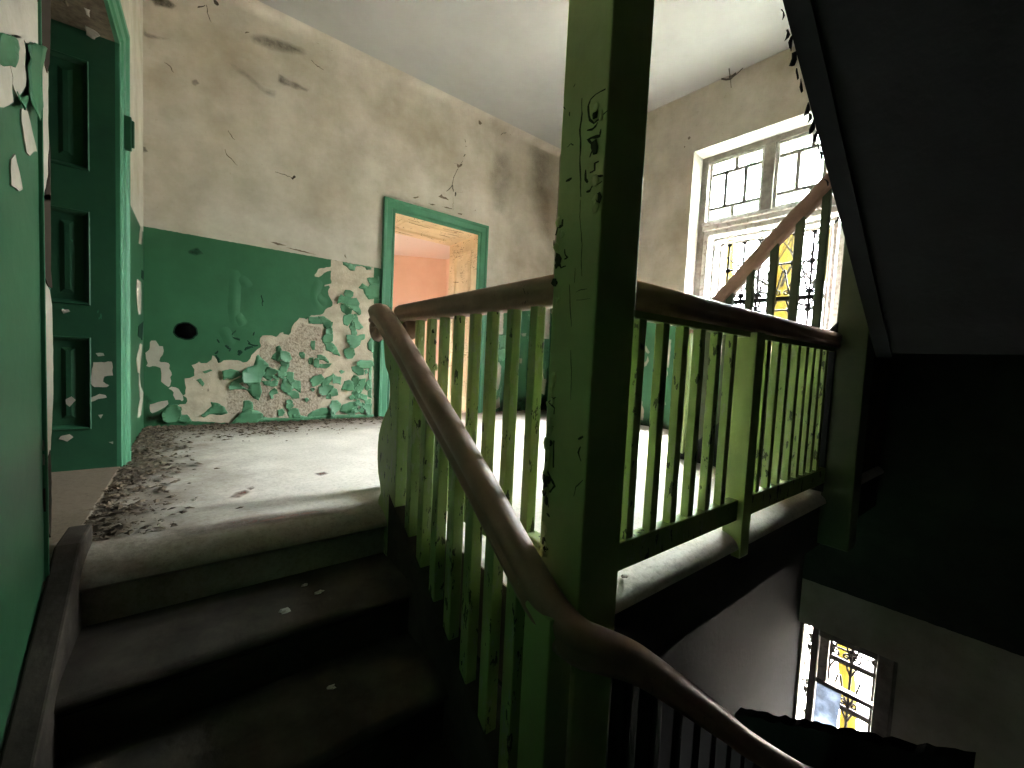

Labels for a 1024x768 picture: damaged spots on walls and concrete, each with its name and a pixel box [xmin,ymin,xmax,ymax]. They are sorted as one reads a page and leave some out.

peeling [84,8,100,40]
crack [438,121,503,200]
peeling [0,0,73,537]
peeling [551,242,562,287]
peeling [91,353,113,402]
peeling [136,255,380,424]